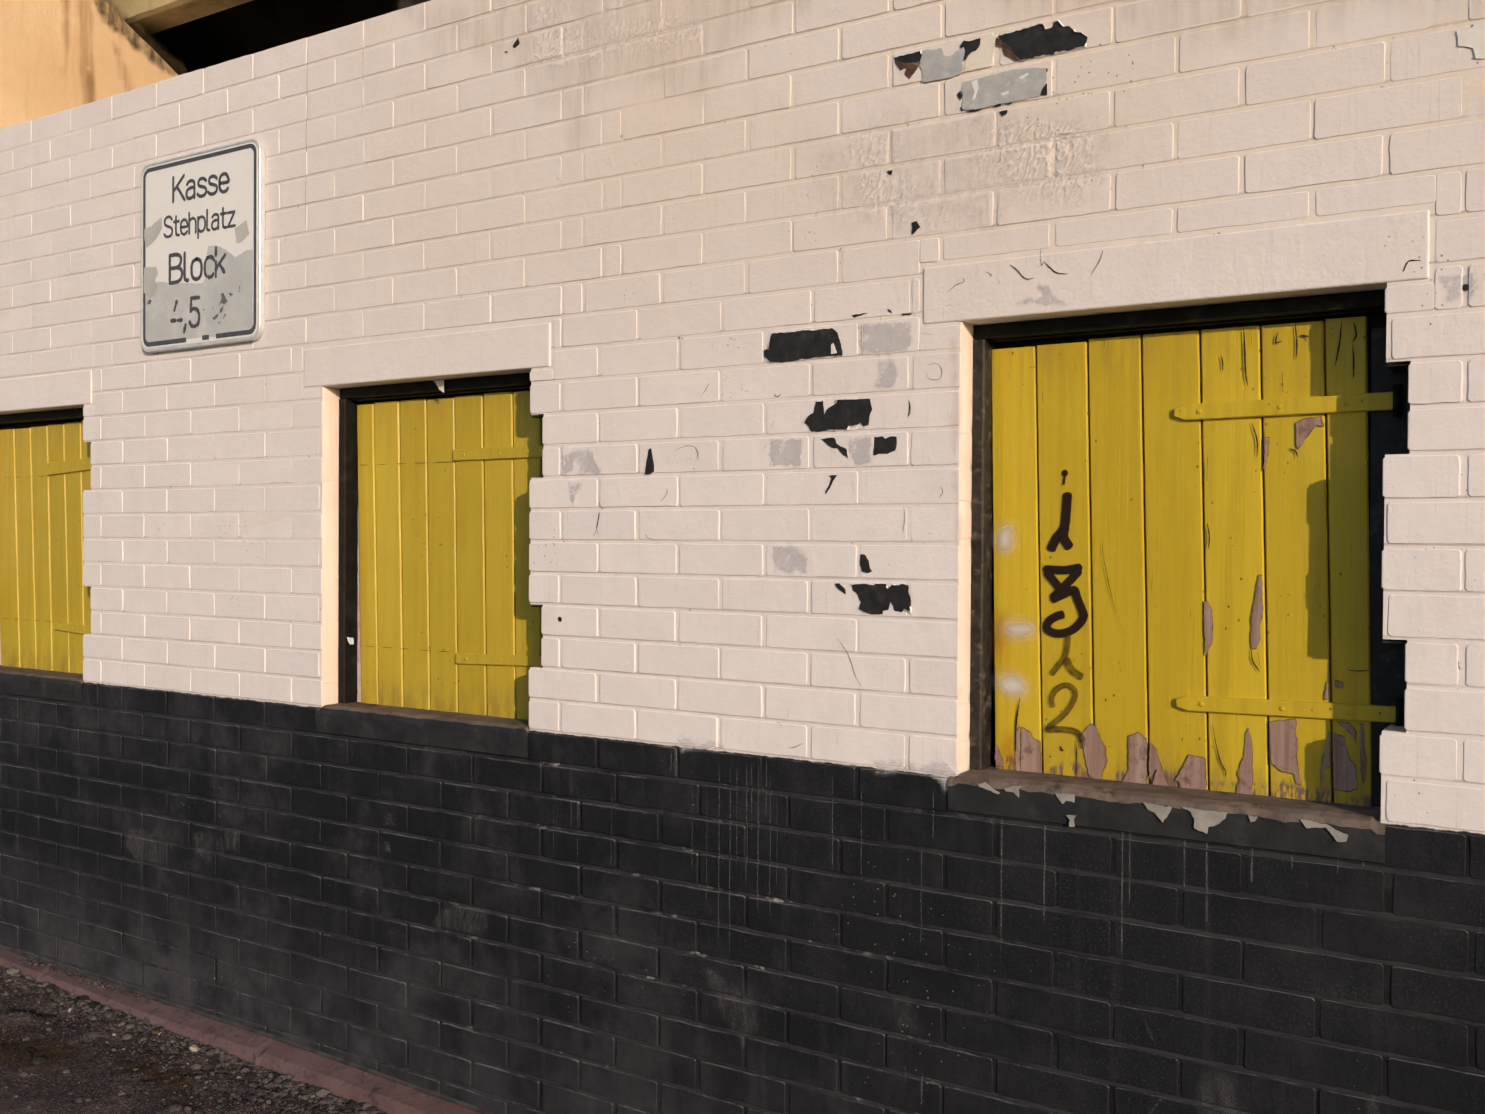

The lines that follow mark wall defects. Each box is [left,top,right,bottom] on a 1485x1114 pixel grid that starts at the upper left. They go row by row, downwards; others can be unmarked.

peeling [895,20,1088,116]
peeling [764,328,843,363]
peeling [770,398,897,465]
peeling [835,554,912,615]
leakage [877,763,955,788]
peeling [977,726,1042,798]
peeling [1079,723,1107,779]
peeling [1123,732,1207,790]
peeling [1236,718,1301,795]
flaking render [1055,793,1076,827]
flaking render [1143,802,1227,834]
flaking render [1301,819,1348,842]